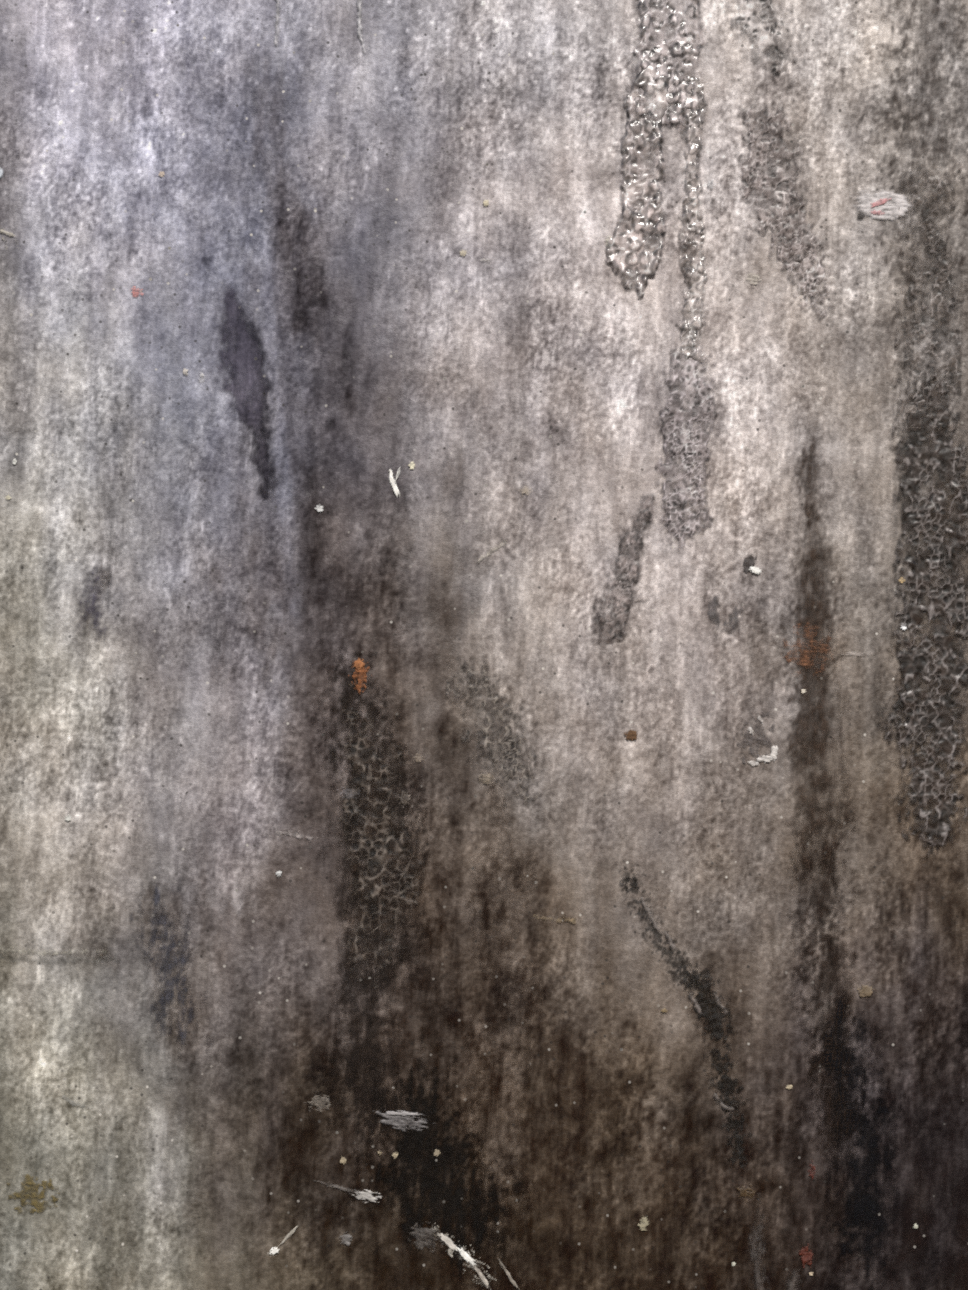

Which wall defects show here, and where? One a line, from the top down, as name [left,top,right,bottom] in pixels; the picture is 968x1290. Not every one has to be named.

rust [348,658,369,692]
damp [331,671,505,1270]